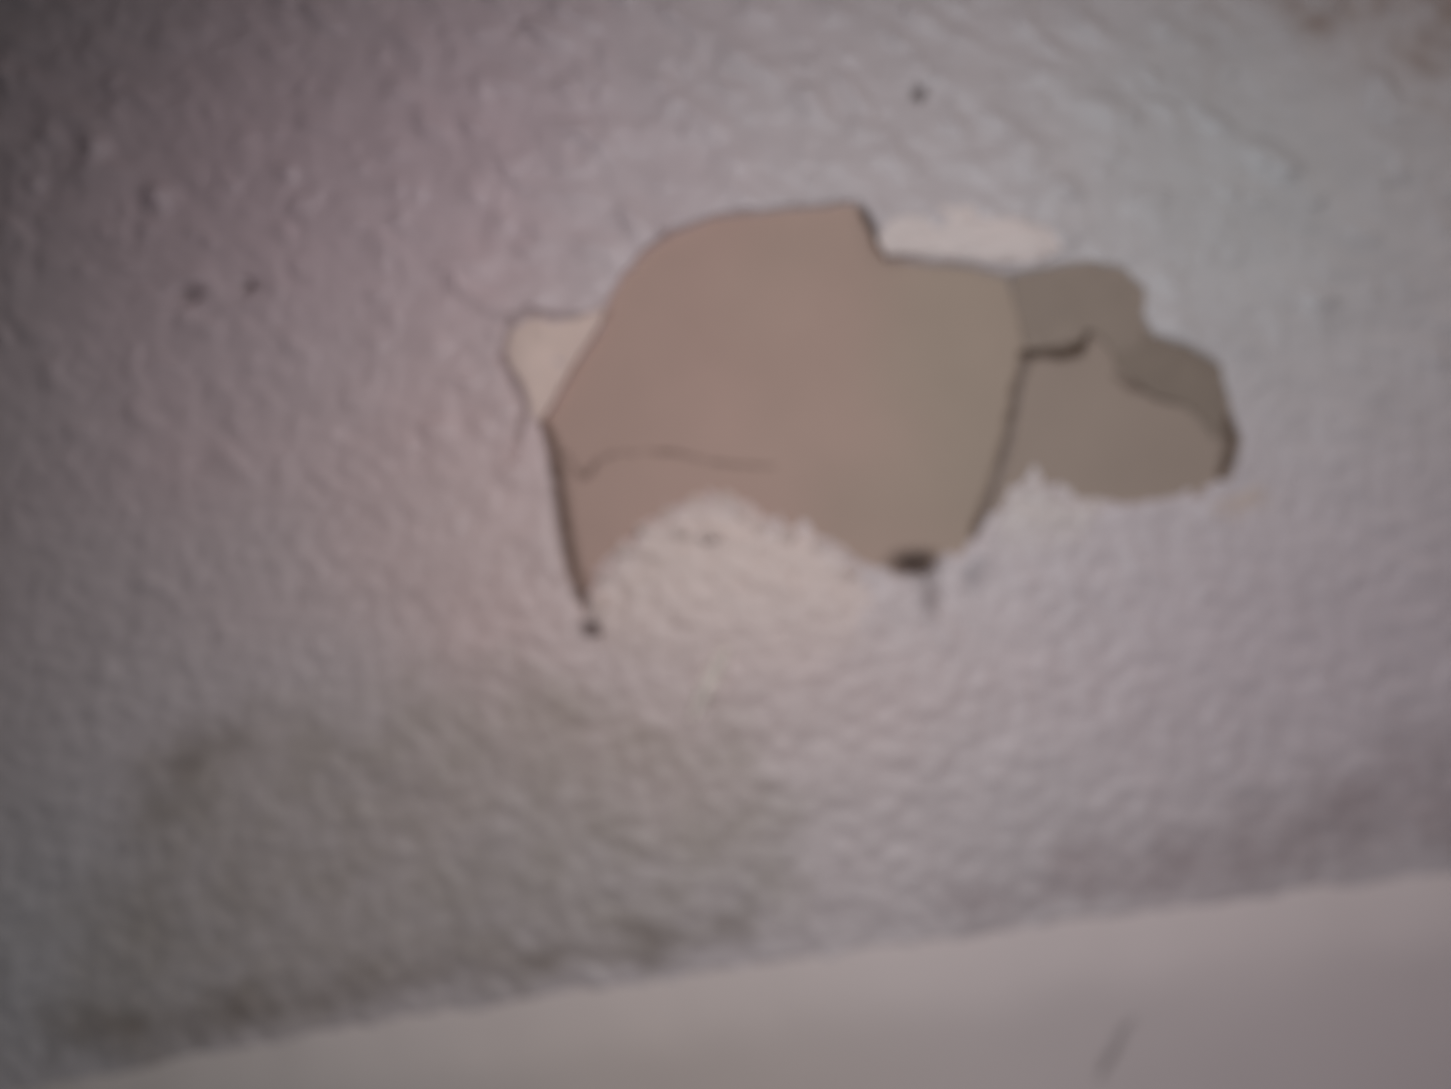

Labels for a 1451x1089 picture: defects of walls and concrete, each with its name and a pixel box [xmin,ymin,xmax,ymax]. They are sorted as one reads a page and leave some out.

peeling [506,205,1241,702]